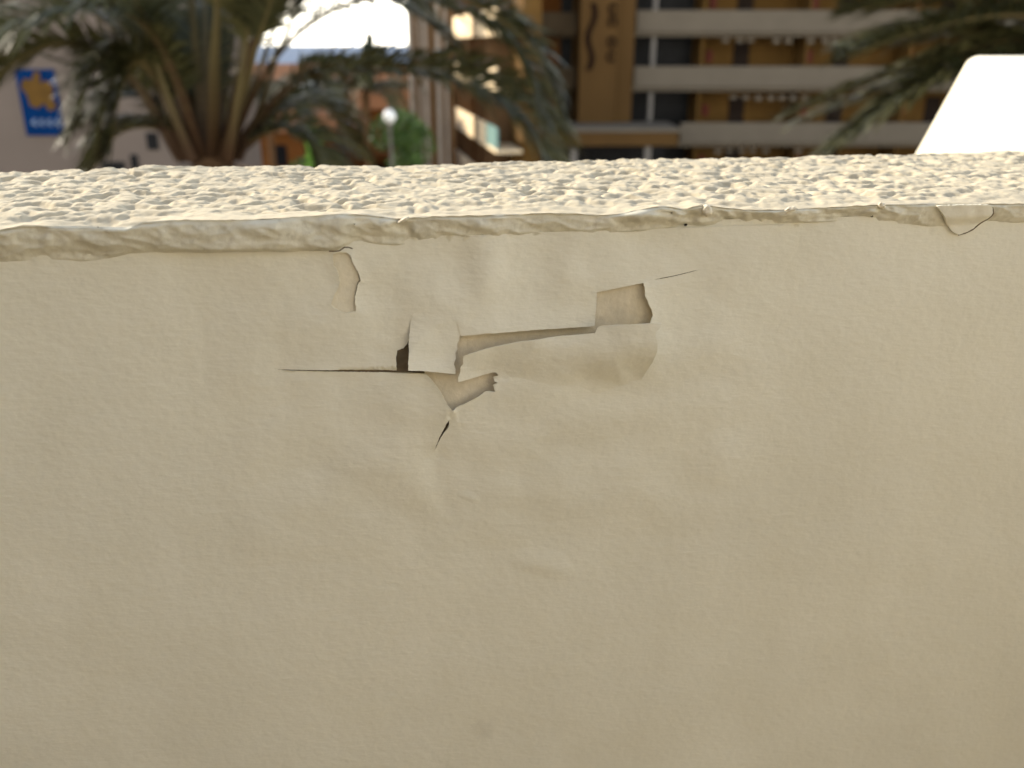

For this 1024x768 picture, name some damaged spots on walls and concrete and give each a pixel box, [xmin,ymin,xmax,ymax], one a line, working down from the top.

peeling [331,252,361,313]
peeling [391,283,662,411]